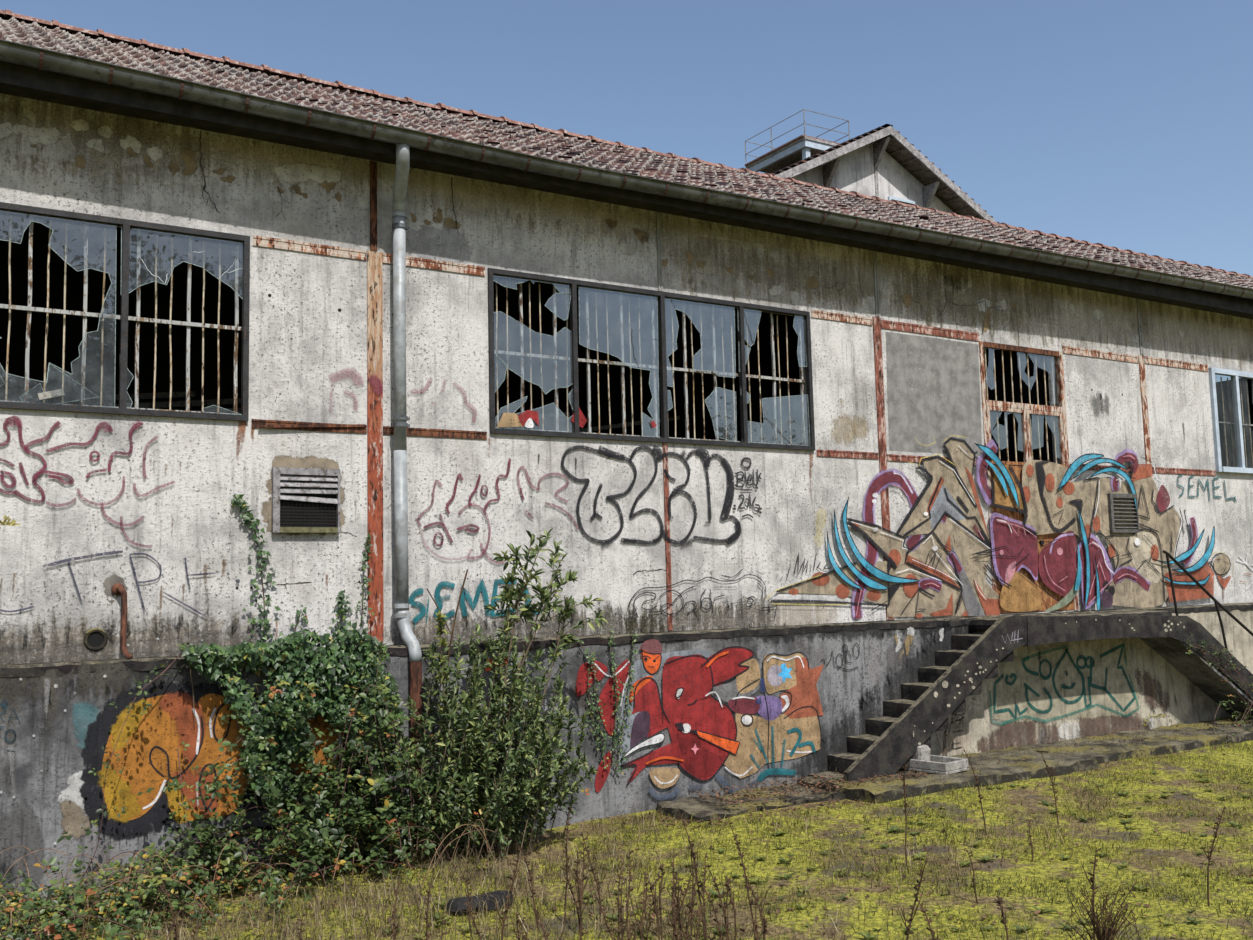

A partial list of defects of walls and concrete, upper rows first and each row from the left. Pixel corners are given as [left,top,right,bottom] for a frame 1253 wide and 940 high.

spalling [261,455,345,535]
water stain [0,611,257,779]
water stain [392,602,977,777]